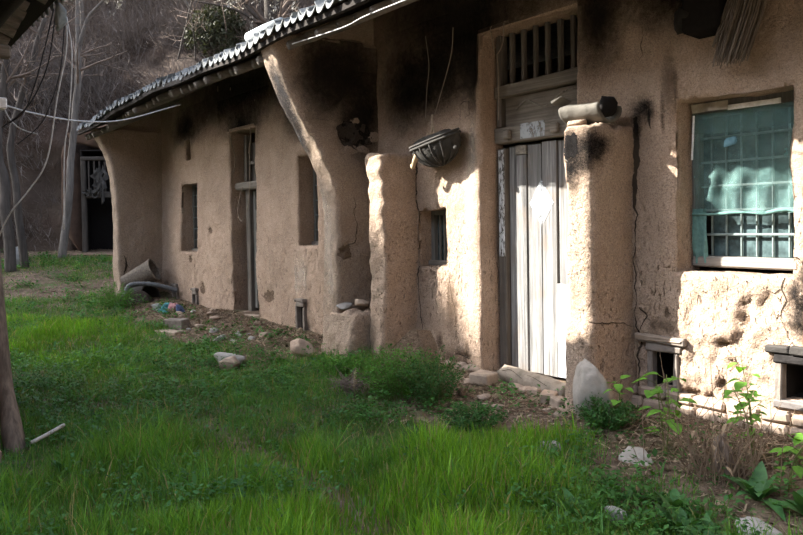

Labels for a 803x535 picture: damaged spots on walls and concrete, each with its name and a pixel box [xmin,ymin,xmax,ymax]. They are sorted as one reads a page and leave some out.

leakage [564,135,607,183]
spalling [336,240,352,259]
crack [589,109,651,387]
crack [765,278,787,330]